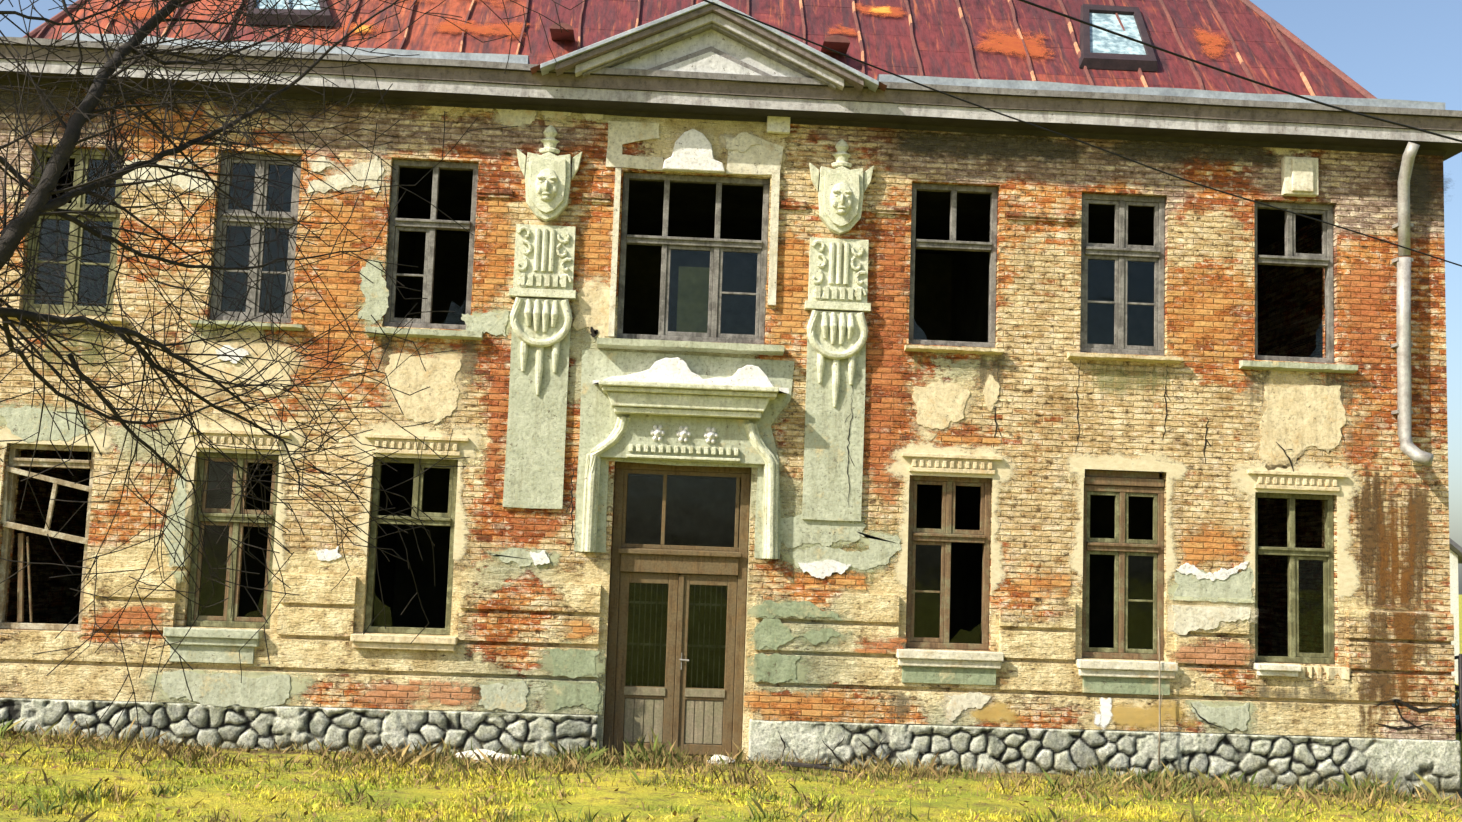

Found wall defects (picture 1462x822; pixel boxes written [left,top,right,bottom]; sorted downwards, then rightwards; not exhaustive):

corrosion [107,7,174,19]
corrosion [339,23,383,36]
corrosion [434,0,529,38]
corrosion [855,4,905,17]
corrosion [975,31,1053,58]
corrosion [1195,28,1232,59]
flaking render [719,132,760,153]
crack [1276,442,1294,472]
flaking render [1168,523,1257,672]
water stain [1259,471,1436,731]
flaking render [744,514,907,721]
crack [1374,699,1444,730]